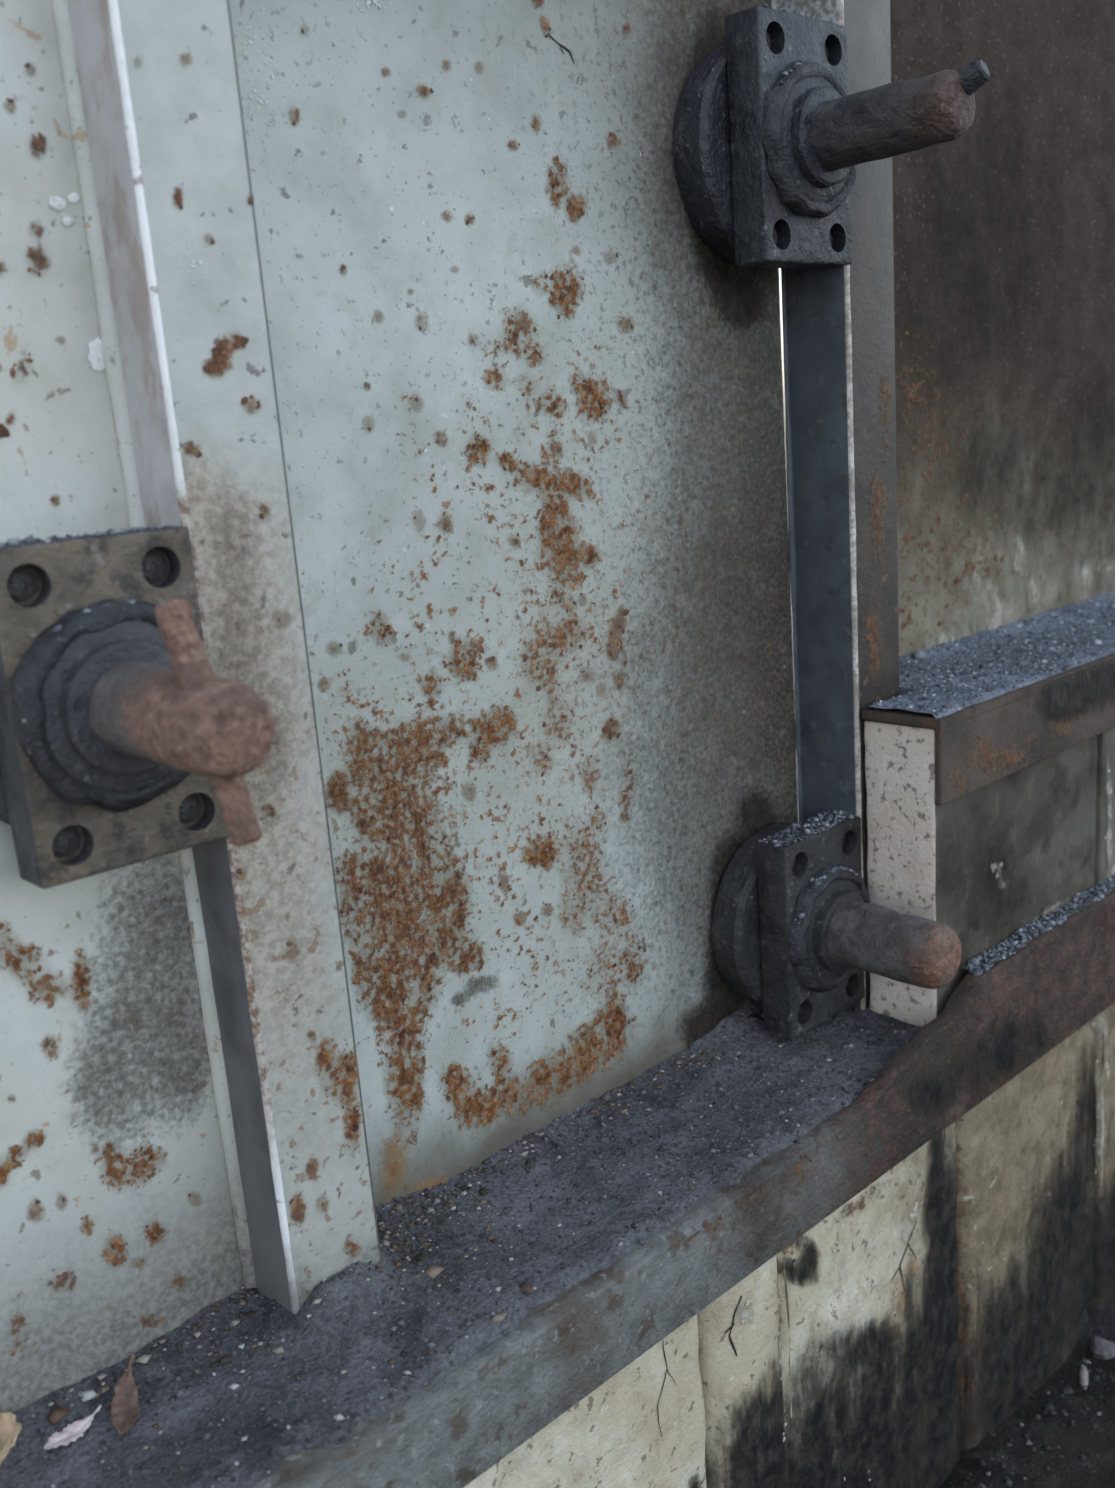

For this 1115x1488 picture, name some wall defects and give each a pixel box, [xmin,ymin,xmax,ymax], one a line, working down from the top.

rust [31,132,46,157]
rust [546,155,589,221]
rust [27,223,49,277]
rust [203,334,249,377]
rust [0,413,15,439]
rust [184,440,202,458]
rust [319,247,667,1191]
rust [0,923,92,1009]
rust [308,1031,361,1157]
rust [0,1129,46,1185]
rust [92,1142,168,1190]
rust [101,1222,168,1269]